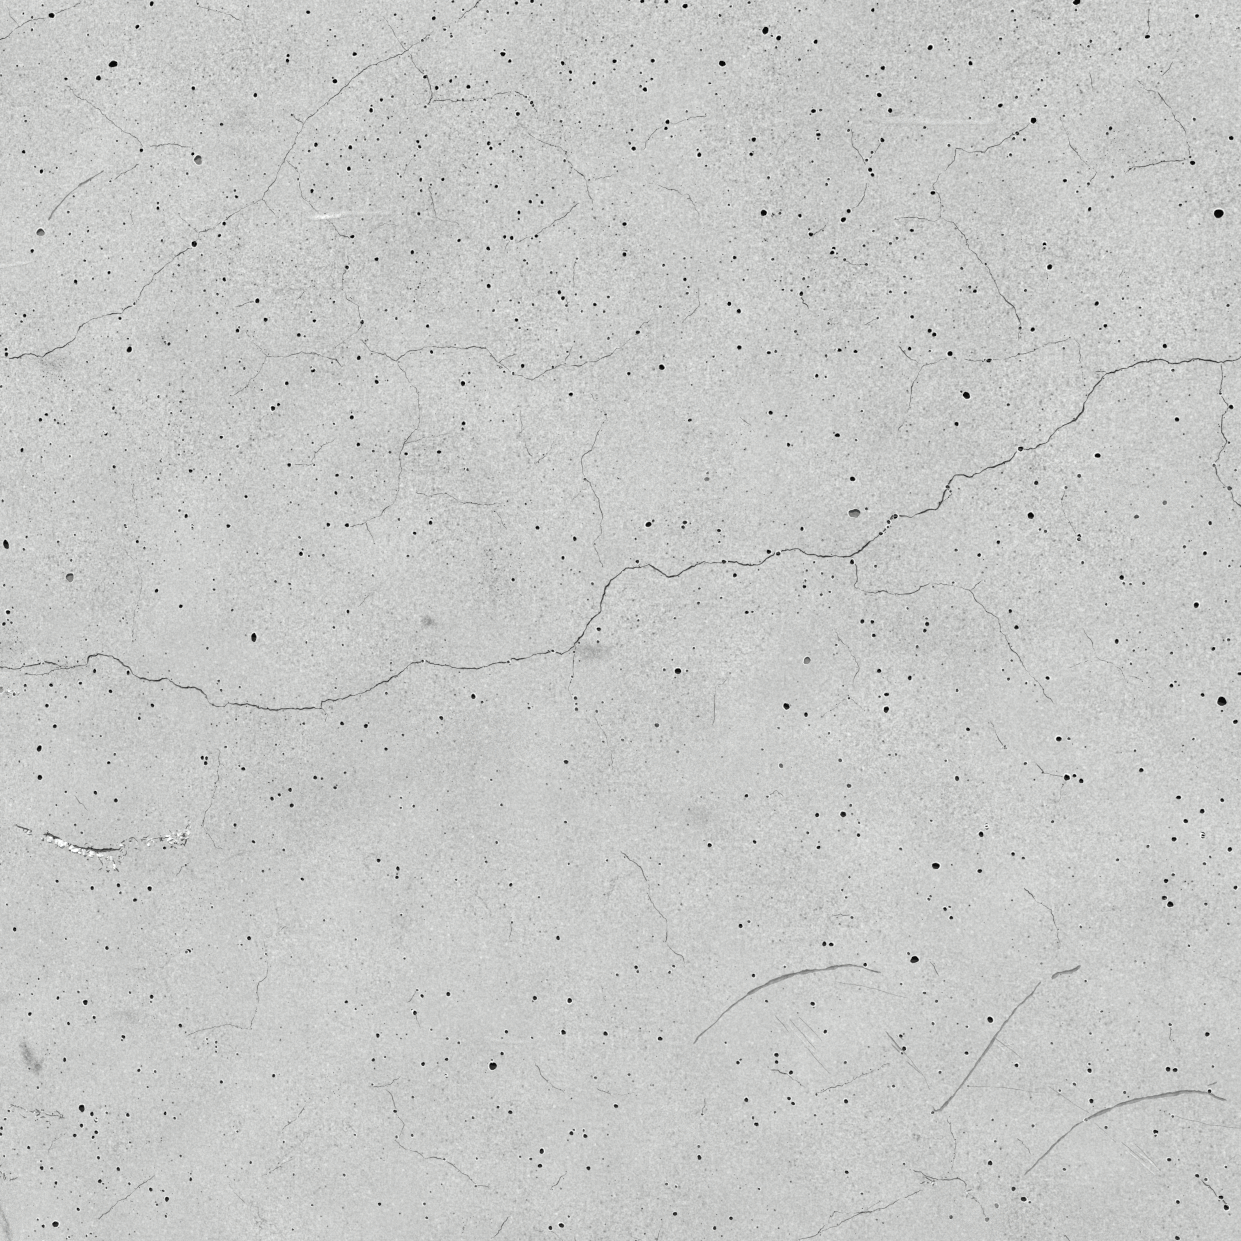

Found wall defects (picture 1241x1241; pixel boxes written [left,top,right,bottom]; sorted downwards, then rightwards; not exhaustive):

crack [0,0,1241,721]
spalling [16,816,192,873]